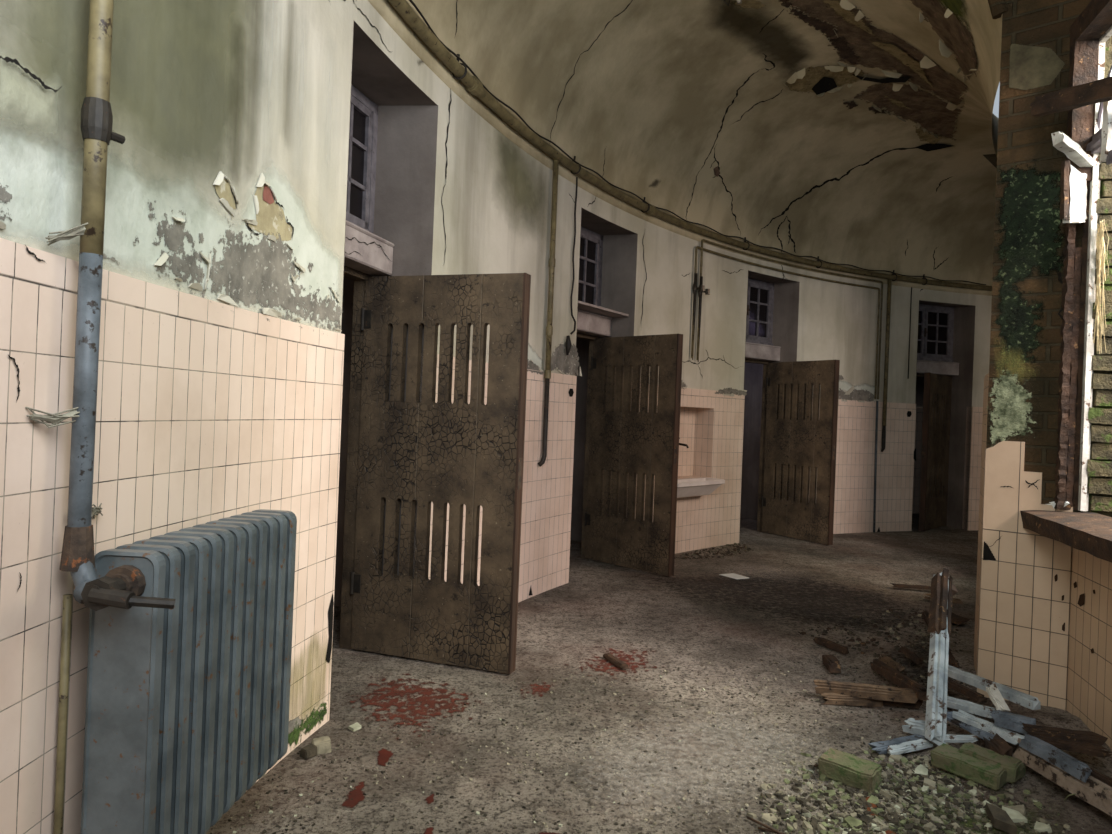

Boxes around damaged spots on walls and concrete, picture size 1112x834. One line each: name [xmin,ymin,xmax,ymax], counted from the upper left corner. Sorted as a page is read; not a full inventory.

flaking render [0,185,12,229]
crack [0,56,62,93]
flaking render [133,171,342,331]
crack [329,0,393,52]
crack [549,0,633,144]
crack [686,9,916,279]
flaking render [735,0,980,144]